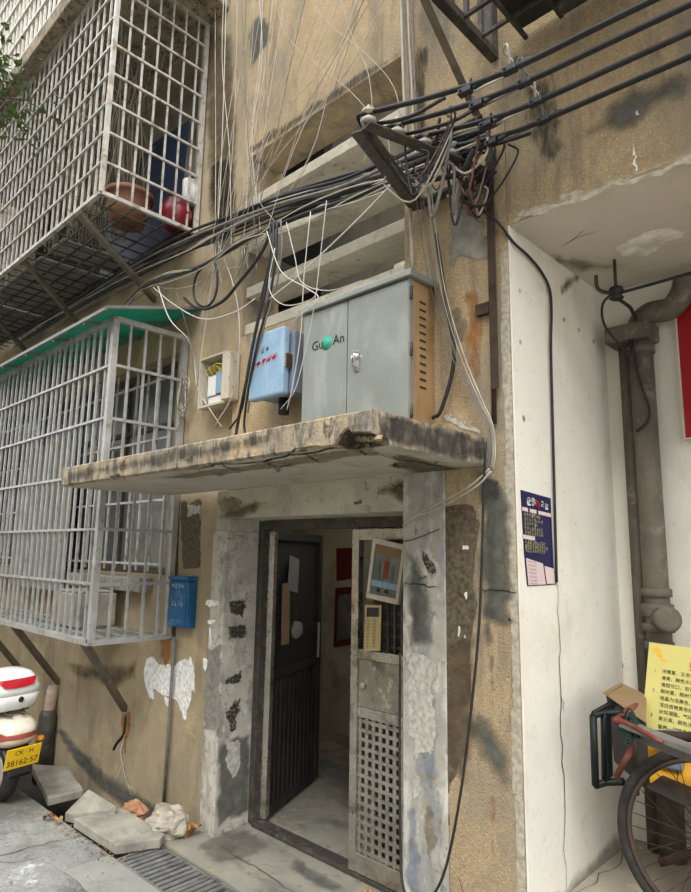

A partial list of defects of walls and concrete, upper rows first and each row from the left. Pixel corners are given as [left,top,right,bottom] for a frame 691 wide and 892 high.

peeling [615,228,686,257]
water stain [68,435,268,481]
peeling [164,430,384,478]
flaking render [421,504,480,701]
water stain [447,249,526,892]
peeling [202,619,241,779]
peeling [405,652,439,762]
flaking render [447,737,457,793]
crack [557,592,623,892]
peeling [425,806,436,853]